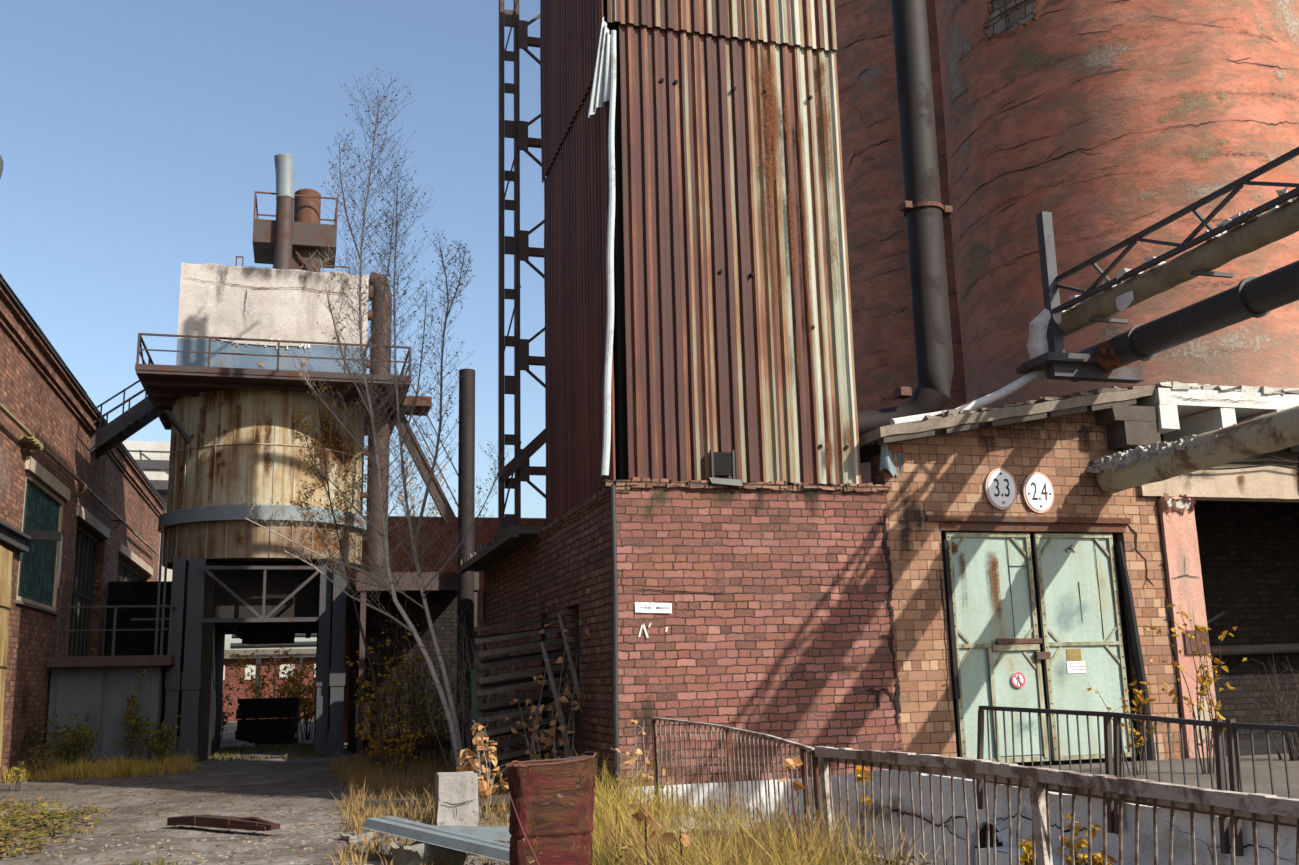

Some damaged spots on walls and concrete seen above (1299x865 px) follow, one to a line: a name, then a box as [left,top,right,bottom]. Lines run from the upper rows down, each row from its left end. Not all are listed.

spalling [981,0,1046,42]
rust [820,62,833,177]
crack [950,0,1299,227]
rust [758,58,814,377]
damp [243,266,349,285]
rust [168,391,272,501]
rust [826,424,853,469]
crack [1173,395,1267,406]
damp [900,492,922,551]
crack [866,496,902,750]
rust [987,555,1001,612]
crack [1127,501,1199,718]